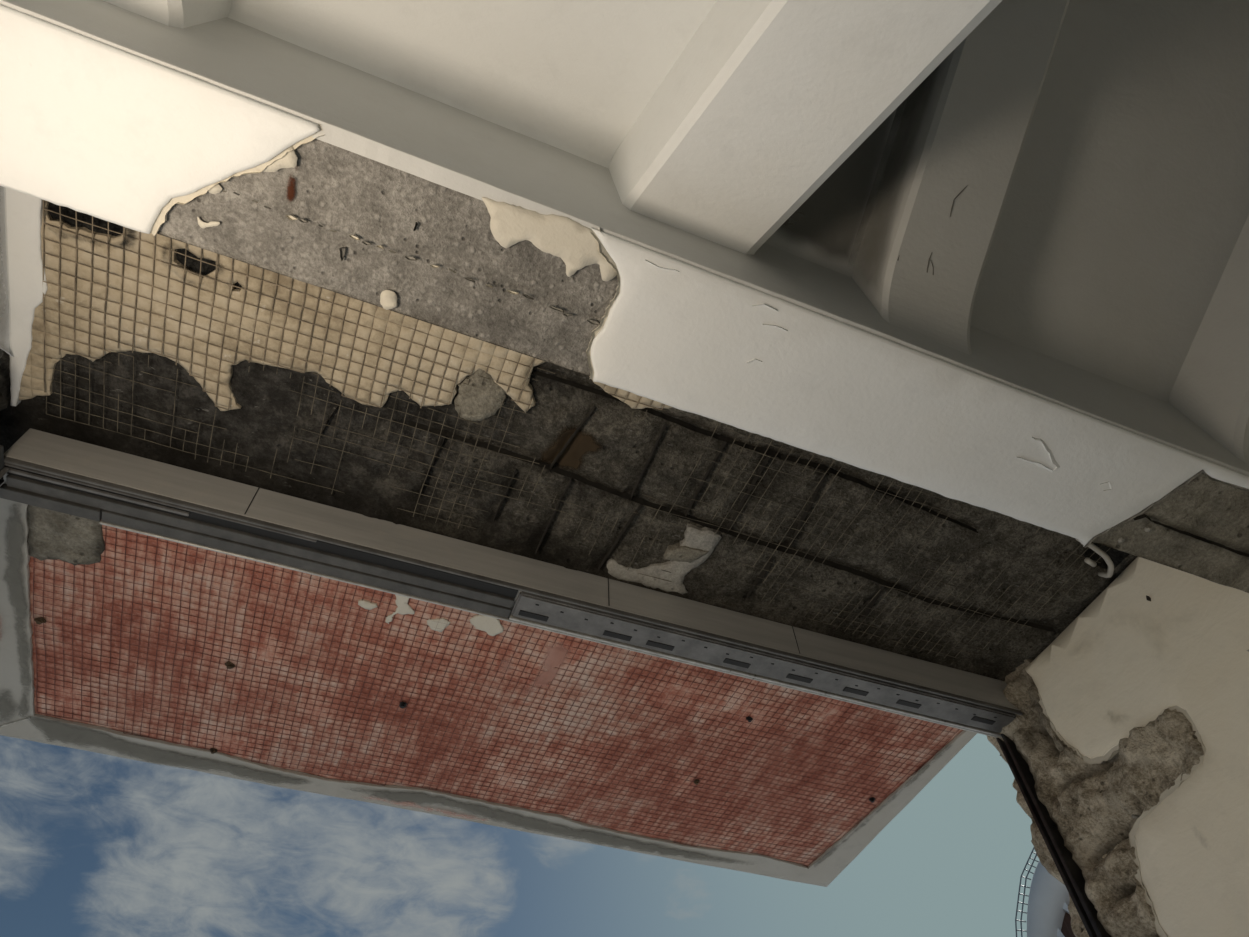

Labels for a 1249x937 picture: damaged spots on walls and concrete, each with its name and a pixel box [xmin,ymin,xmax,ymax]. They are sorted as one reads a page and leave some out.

spalling [0,124,1249,684]
spalling [1013,672,1206,937]